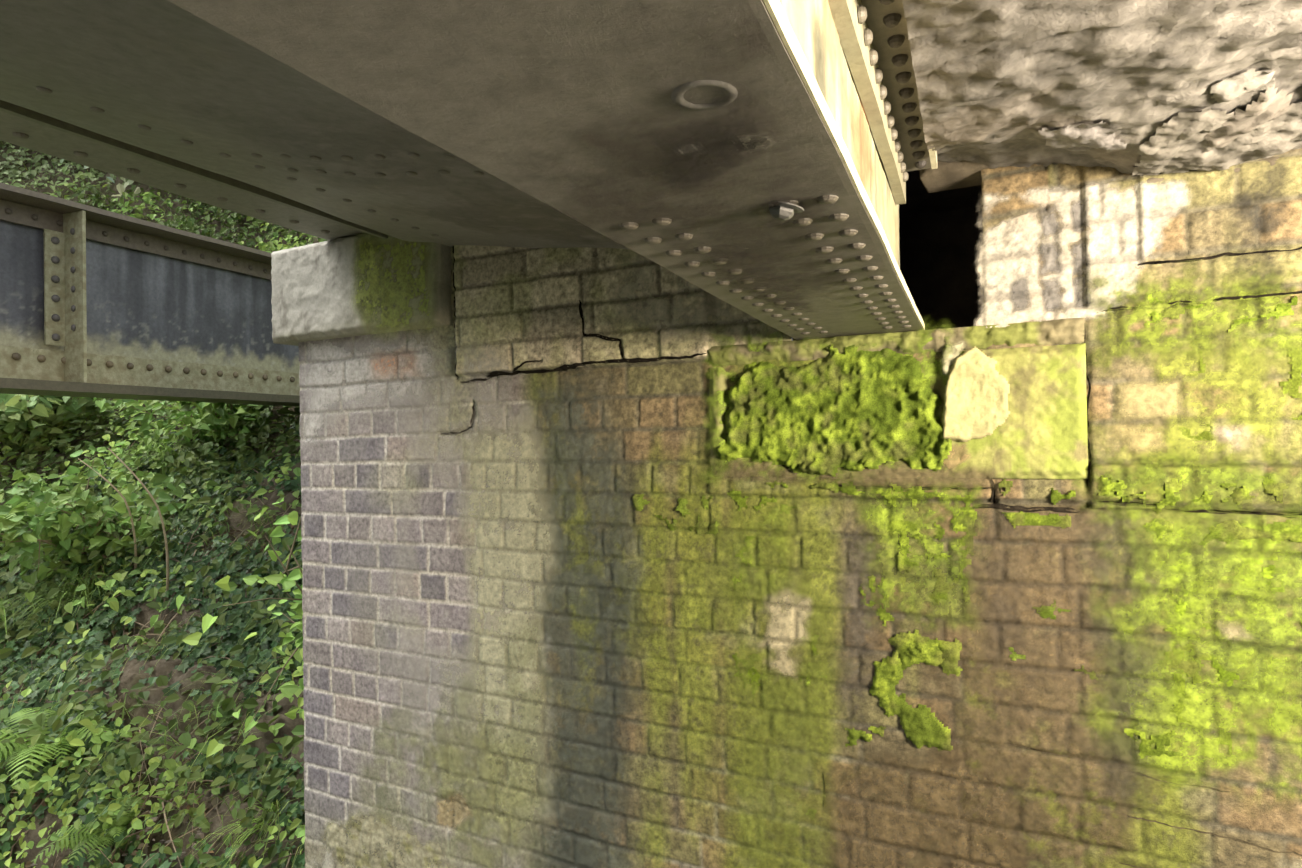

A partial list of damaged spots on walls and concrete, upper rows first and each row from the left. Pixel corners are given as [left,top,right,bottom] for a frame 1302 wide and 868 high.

peeling [976,68,1302,328]
leakage [1240,179,1278,233]
crack [1169,291,1302,307]
crack [442,246,707,434]
spalling [942,343,1010,469]
crack [838,306,1302,518]
leakage [1118,380,1184,451]
leakage [713,460,992,487]
leakage [763,595,810,676]
leakage [826,507,1147,868]
spalling [313,815,450,868]
spalling [437,793,470,829]